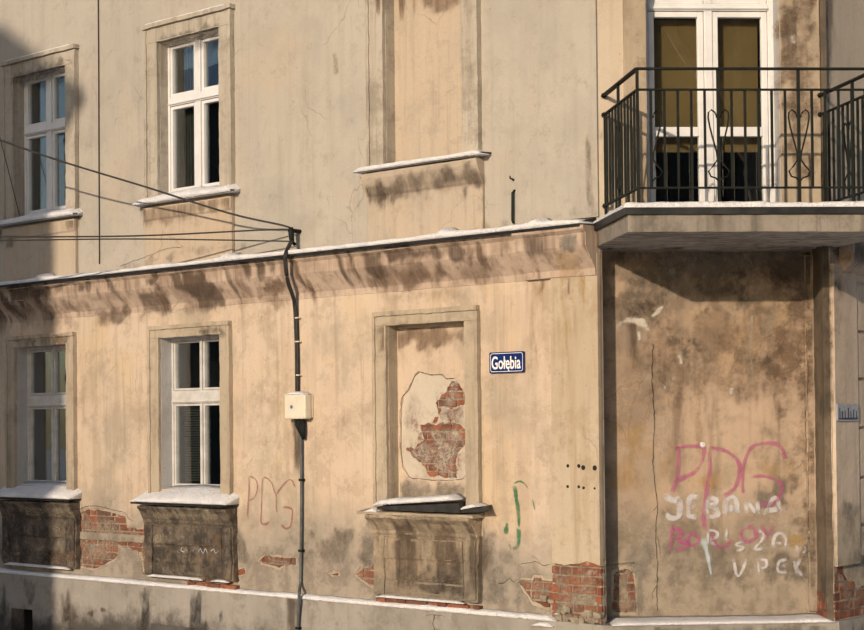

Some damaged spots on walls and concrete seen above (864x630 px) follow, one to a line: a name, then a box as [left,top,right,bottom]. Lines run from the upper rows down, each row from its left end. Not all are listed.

leakage [0,283,49,321]
leakage [172,270,224,307]
leakage [242,261,264,277]
leakage [338,243,485,287]
spalling [400,371,466,481]
crack [651,345,660,610]
spalling [80,508,145,574]
spalling [258,554,297,570]
leakage [190,600,207,630]
leakage [288,598,296,630]
spalling [515,559,638,624]
spalling [807,566,864,620]